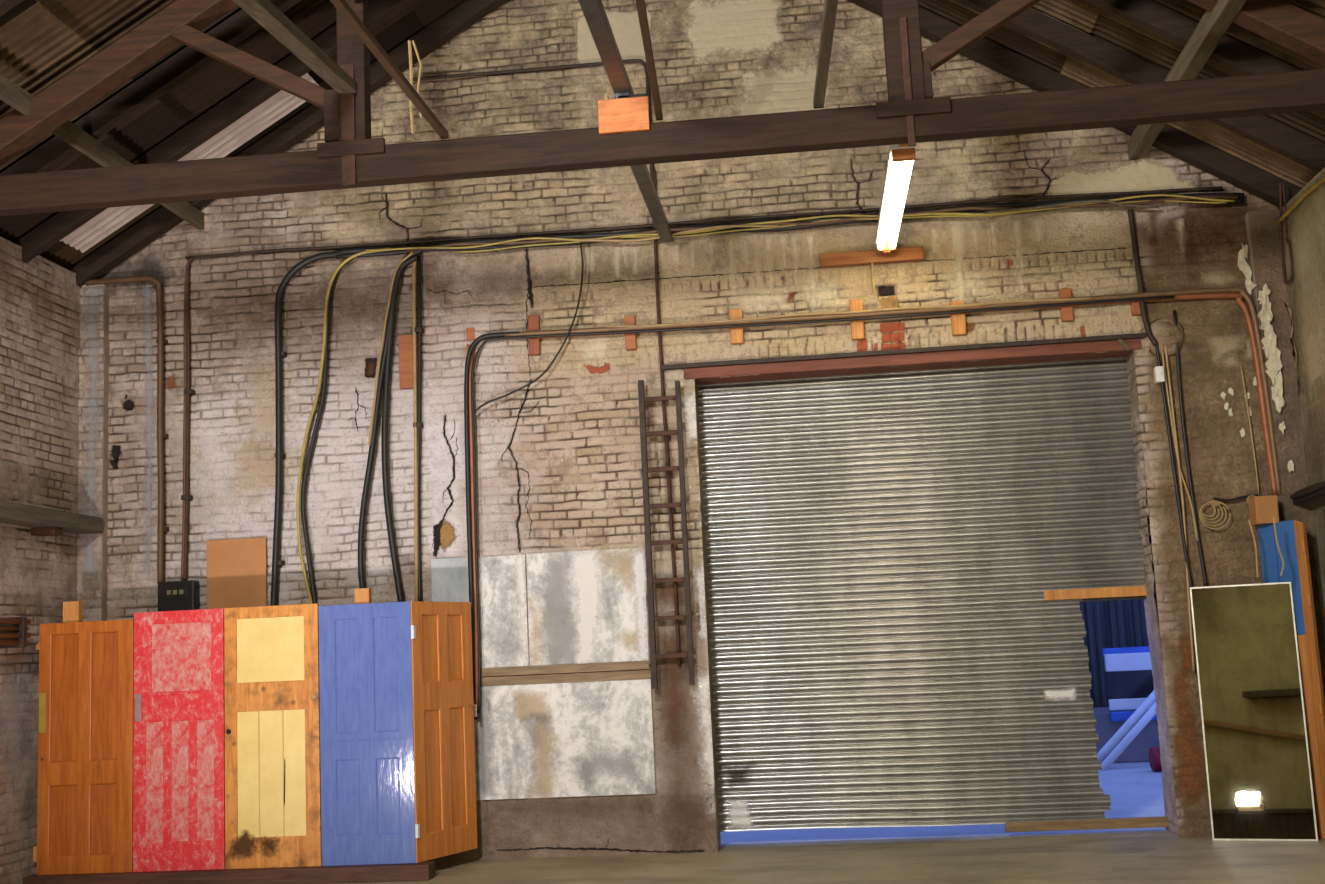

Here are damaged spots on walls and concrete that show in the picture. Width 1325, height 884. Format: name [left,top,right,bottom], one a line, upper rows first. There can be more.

crack [918,248,1126,262]
spalling [585,363,609,374]
crack [501,249,820,551]
peeling [1191,244,1299,437]
spalling [433,519,455,556]
crack [432,415,459,557]